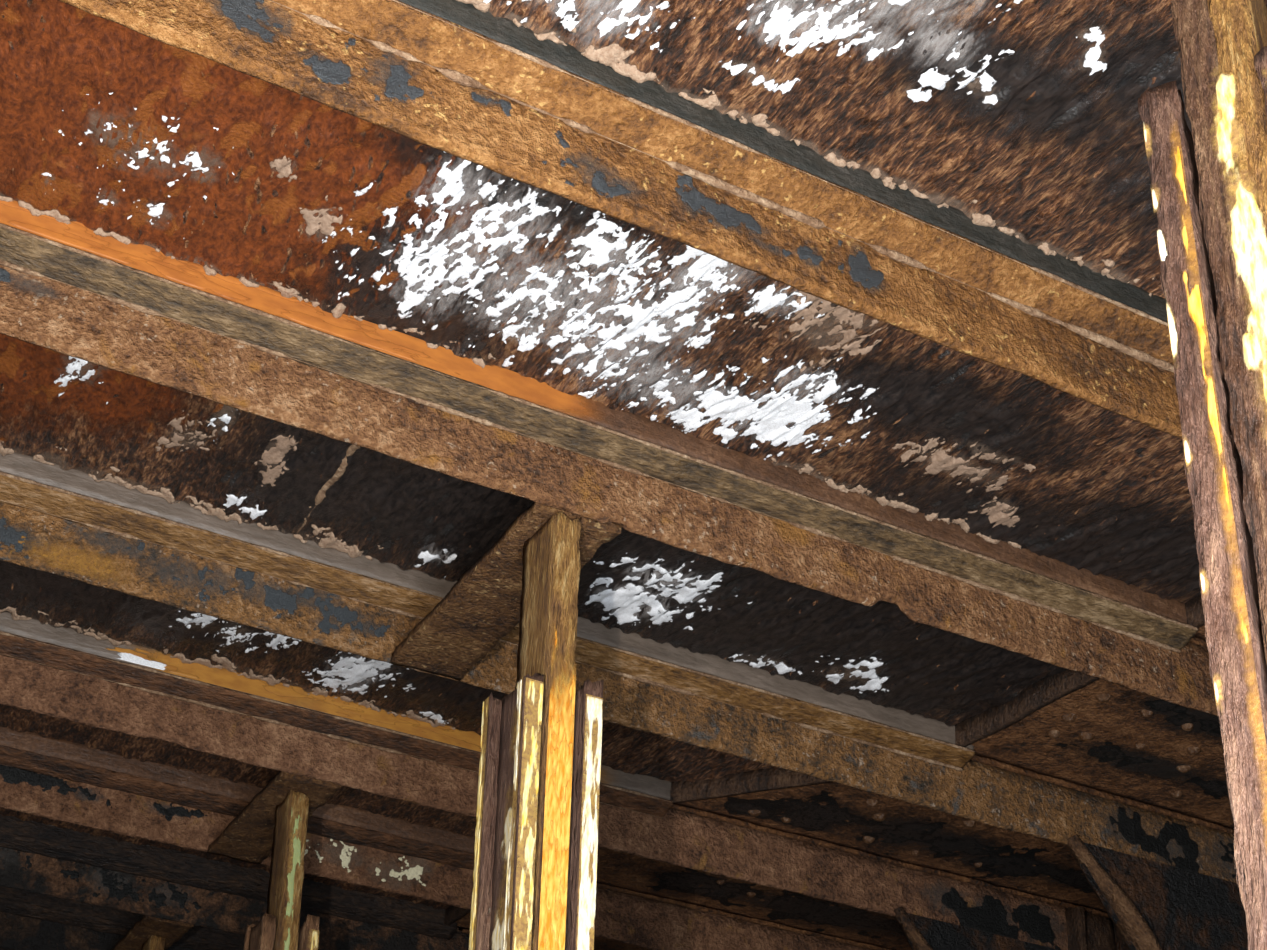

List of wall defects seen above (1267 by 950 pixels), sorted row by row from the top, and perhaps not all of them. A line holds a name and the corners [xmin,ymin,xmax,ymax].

rust [0,333,186,433]
rust [0,0,588,414]
leakage [206,418,534,582]
leakage [324,216,510,362]
leakage [784,291,1201,600]
leakage [867,5,1192,232]
peeling [1157,230,1167,261]
peeling [1166,305,1177,356]
peeling [1184,441,1192,464]
peeling [1215,74,1267,403]
leakage [578,527,1067,726]
peeling [469,678,544,950]